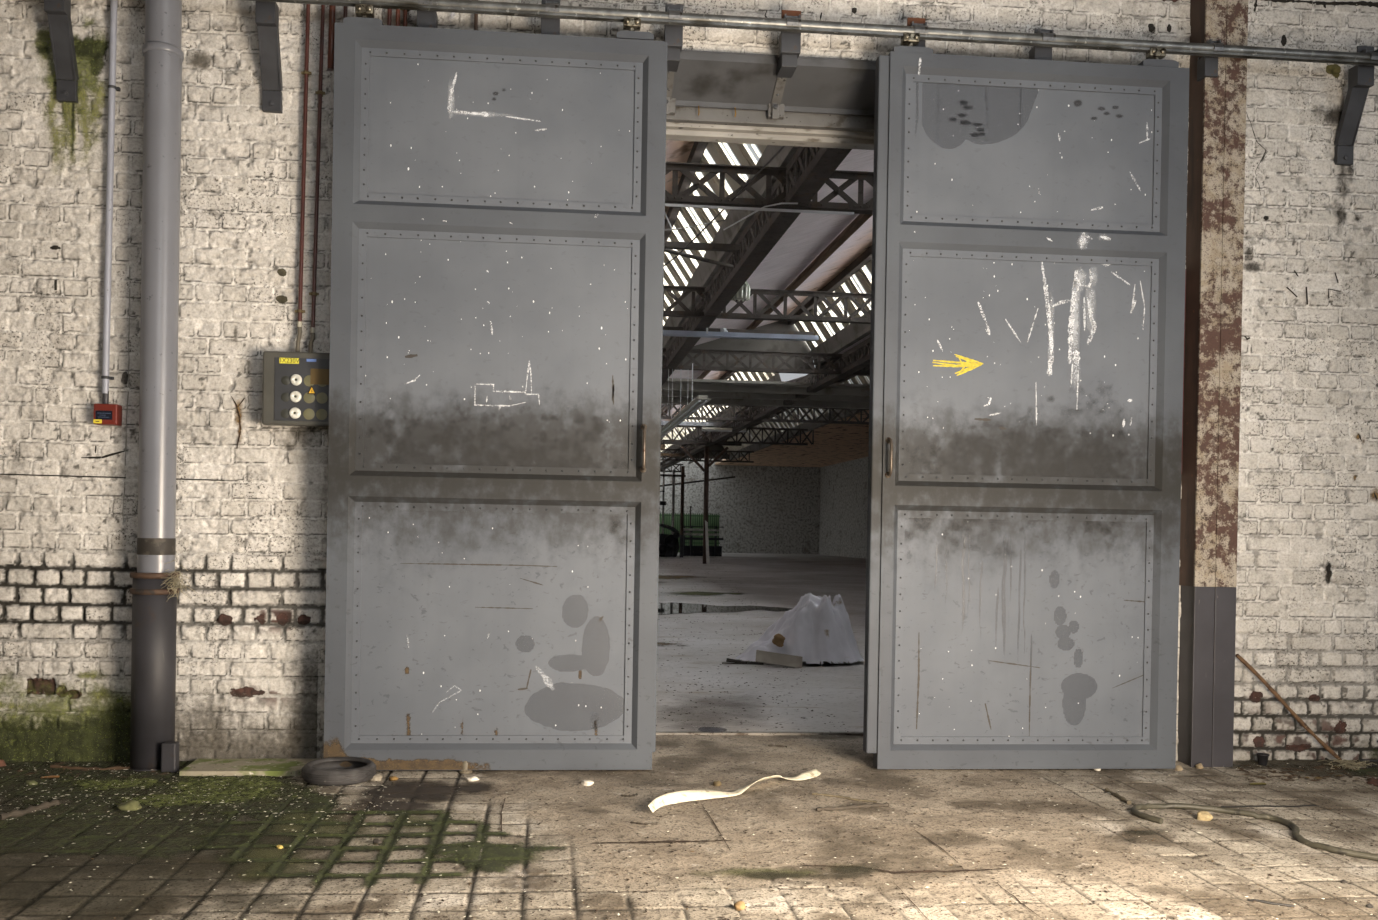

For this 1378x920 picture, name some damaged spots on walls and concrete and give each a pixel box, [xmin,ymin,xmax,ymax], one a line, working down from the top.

water stain [48,82,107,163]